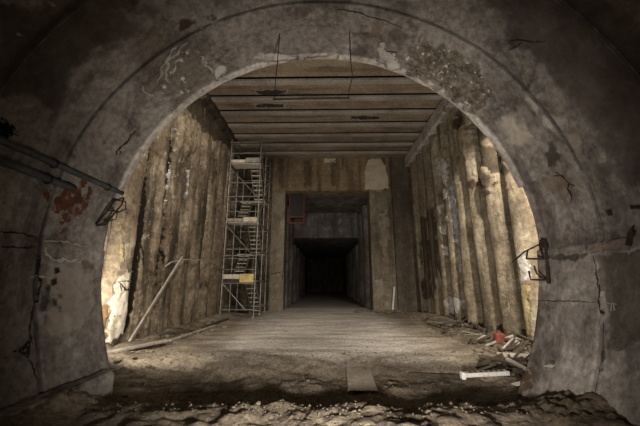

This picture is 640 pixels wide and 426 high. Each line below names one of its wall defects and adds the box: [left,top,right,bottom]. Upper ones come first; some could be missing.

spalling [375,35,497,115]
crack [116,130,136,157]
corrosion [42,177,95,235]
crack [554,171,574,203]
crack [0,231,43,380]
crack [538,256,605,372]